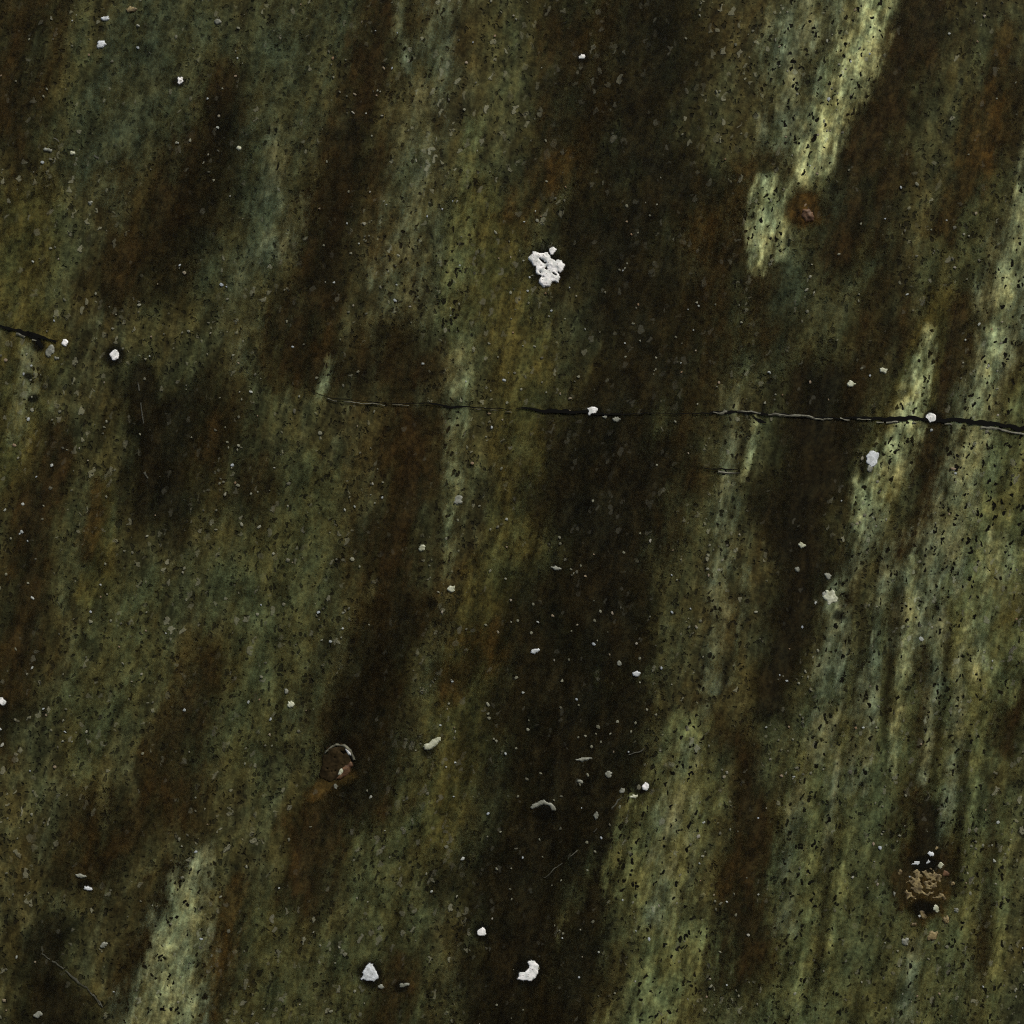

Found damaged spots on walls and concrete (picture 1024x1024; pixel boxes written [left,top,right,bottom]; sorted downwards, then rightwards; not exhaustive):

corrosion [785,189,820,226]
crack [0,325,57,348]
crack [306,390,1024,435]
leakage [261,0,1024,1024]